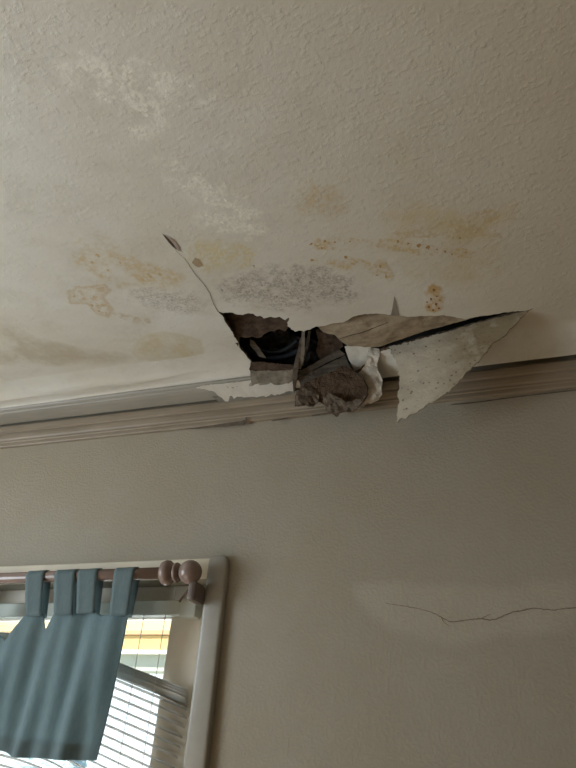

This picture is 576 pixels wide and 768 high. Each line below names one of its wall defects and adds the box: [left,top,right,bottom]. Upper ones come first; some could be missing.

leakage [379,193,521,293]
leakage [0,230,368,367]
spalling [239,327,320,350]
spalling [299,343,351,370]
spalling [371,312,509,349]
crack [387,603,576,626]